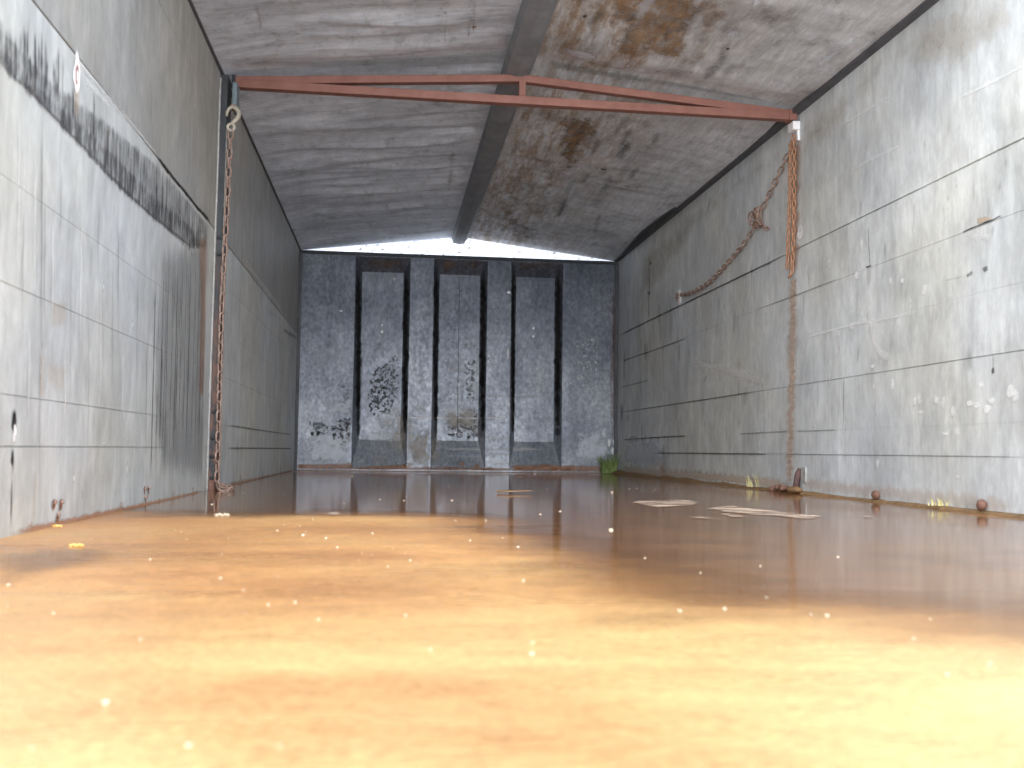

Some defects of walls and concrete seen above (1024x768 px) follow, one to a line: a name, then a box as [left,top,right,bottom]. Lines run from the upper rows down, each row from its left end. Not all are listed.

damp [24,35,59,91]